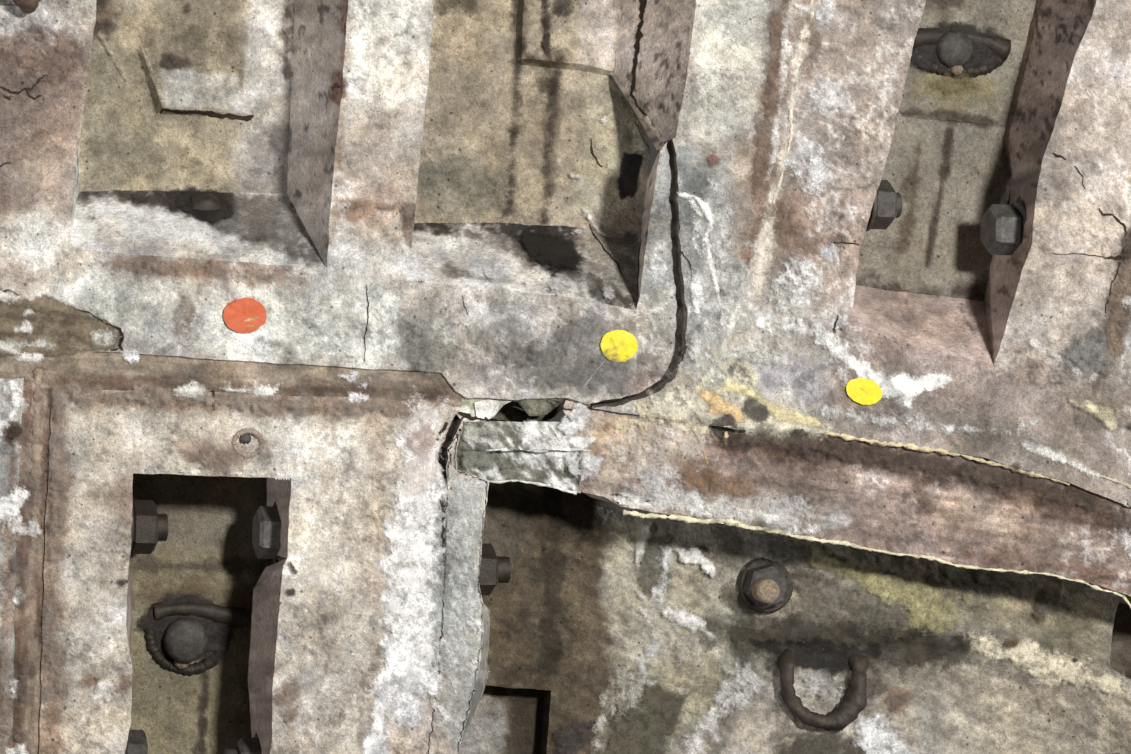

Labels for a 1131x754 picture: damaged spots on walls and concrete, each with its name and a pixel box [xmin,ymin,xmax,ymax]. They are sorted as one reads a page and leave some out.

crack [161,108,254,122]
crack [549,0,721,411]
water stain [0,380,28,436]
spalling [457,398,603,495]
crack [435,410,489,549]
water stain [0,487,42,536]
water stain [5,744,27,754]